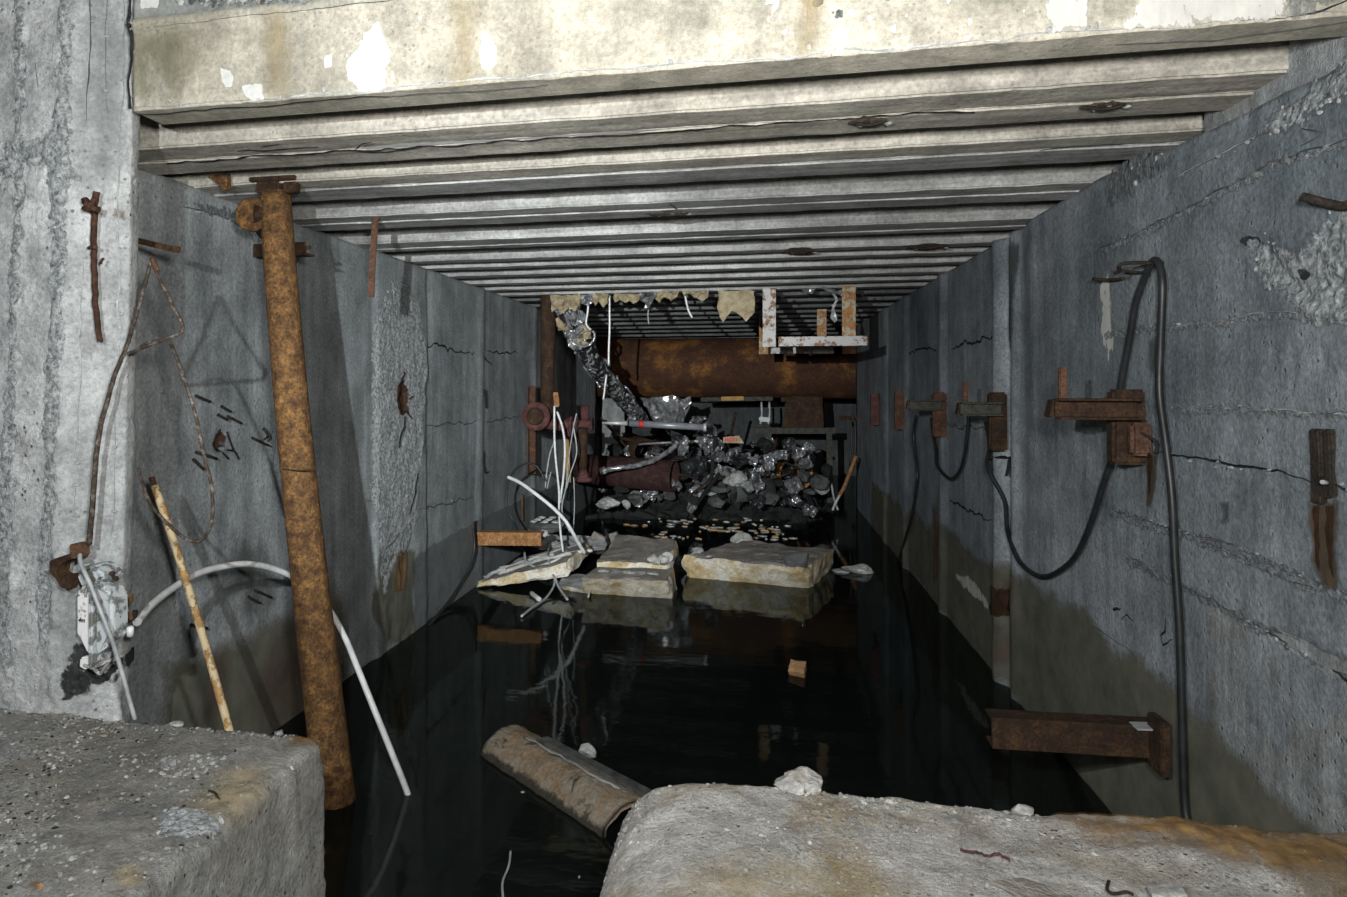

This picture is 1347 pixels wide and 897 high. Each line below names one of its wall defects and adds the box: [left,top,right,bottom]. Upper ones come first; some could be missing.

peeling [134,0,1337,108]
crack [1116,0,1347,45]
crack [1099,128,1347,255]
spalling [1240,211,1347,328]
crack [1169,404,1347,422]
crack [1161,451,1347,491]
crack [1094,507,1347,657]
rust [1309,503,1337,589]
leakage [60,643,135,700]
leakage [167,617,304,736]
leakage [334,601,348,683]